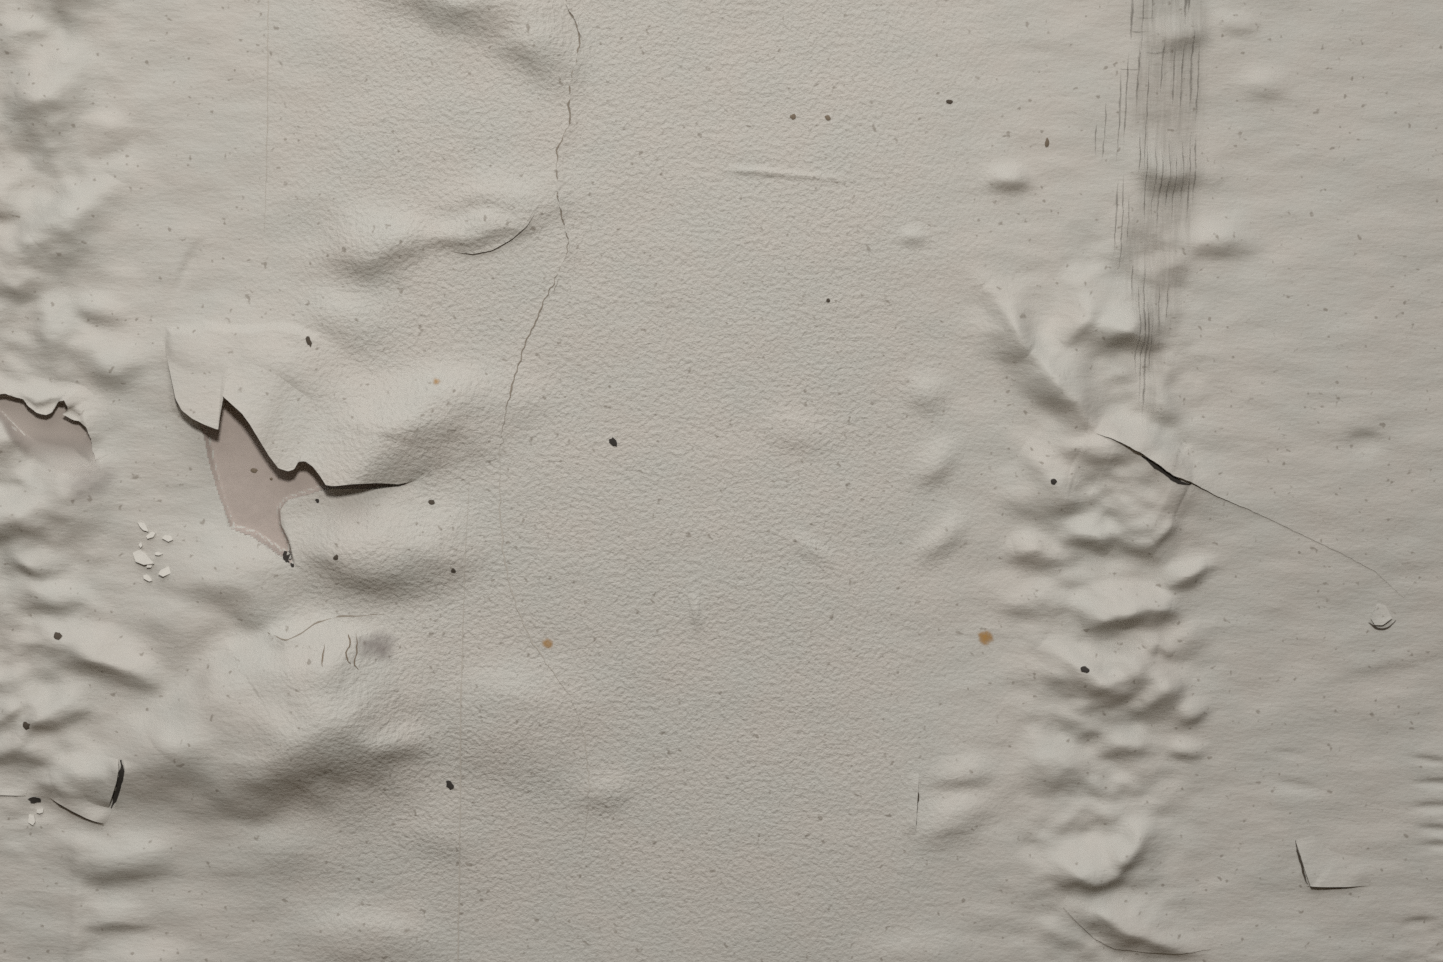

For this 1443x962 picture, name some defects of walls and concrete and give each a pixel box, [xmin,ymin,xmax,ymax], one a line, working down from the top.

peeling [0,371,116,460]
peeling [165,328,444,587]
crack [1096,413,1416,598]
crack [0,754,146,825]
peeling [1295,835,1377,889]